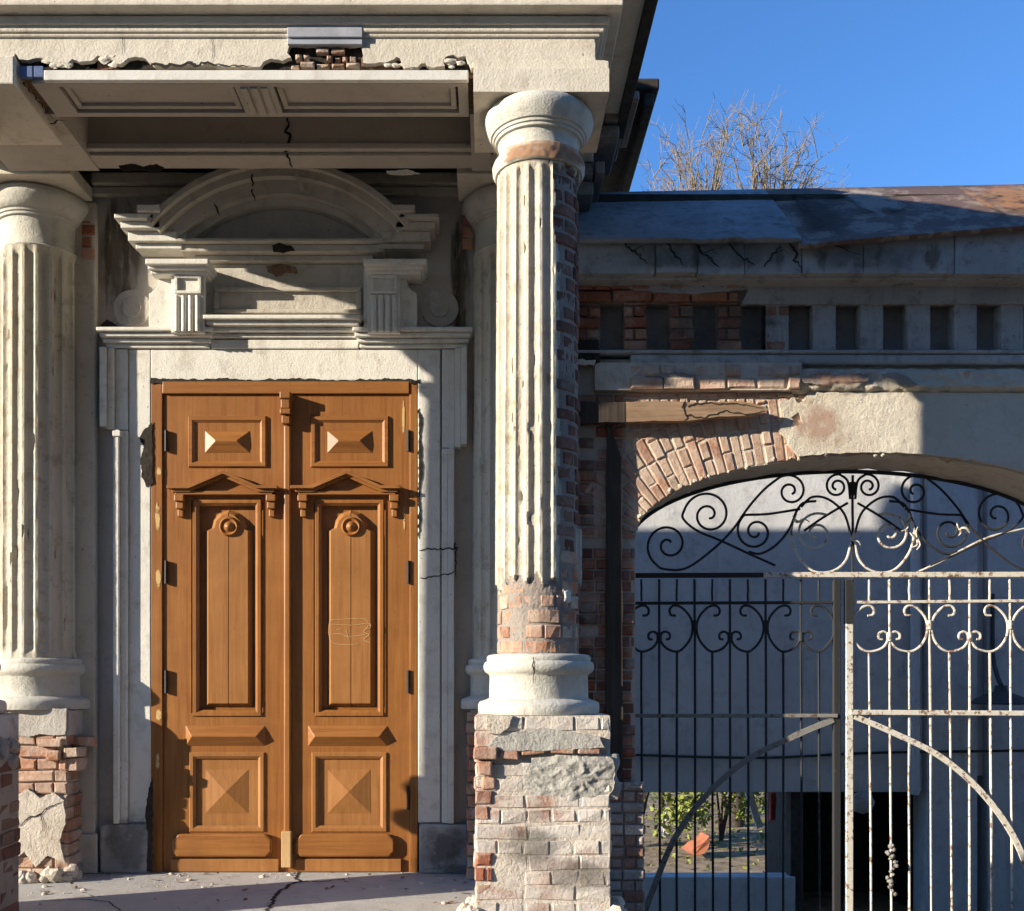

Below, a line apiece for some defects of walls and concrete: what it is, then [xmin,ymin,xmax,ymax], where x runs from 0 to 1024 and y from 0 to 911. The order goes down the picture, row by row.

peeling [98,55,127,68]
flaking render [289,47,363,70]
crack [284,118,304,192]
flaking render [266,242,299,277]
crack [624,243,803,269]
flaking render [497,140,585,654]
spalling [800,372,917,386]
flaking render [139,423,154,487]
crack [419,542,458,579]
spalling [473,747,601,819]
crack [265,872,353,911]
flaking render [475,852,492,894]